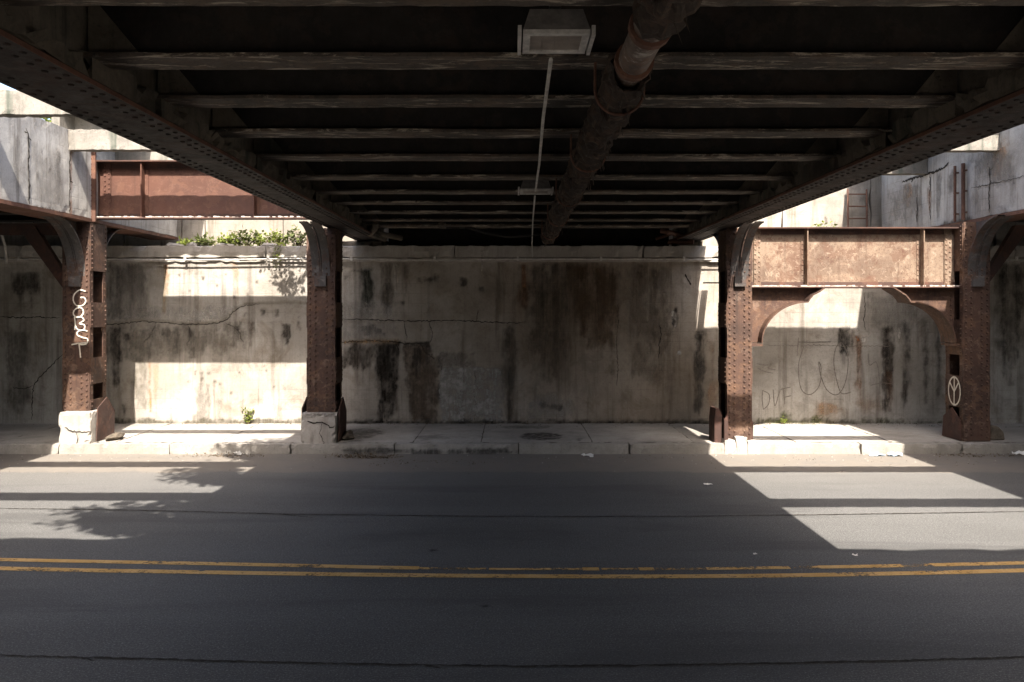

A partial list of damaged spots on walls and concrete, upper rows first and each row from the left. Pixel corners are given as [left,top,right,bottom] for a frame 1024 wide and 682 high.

crack [902,162,949,221]
crack [972,167,1022,213]
water stain [362,265,403,311]
crack [107,304,254,343]
water stain [343,341,442,441]
crack [342,313,522,359]
water stain [694,331,705,414]
water stain [871,297,912,410]